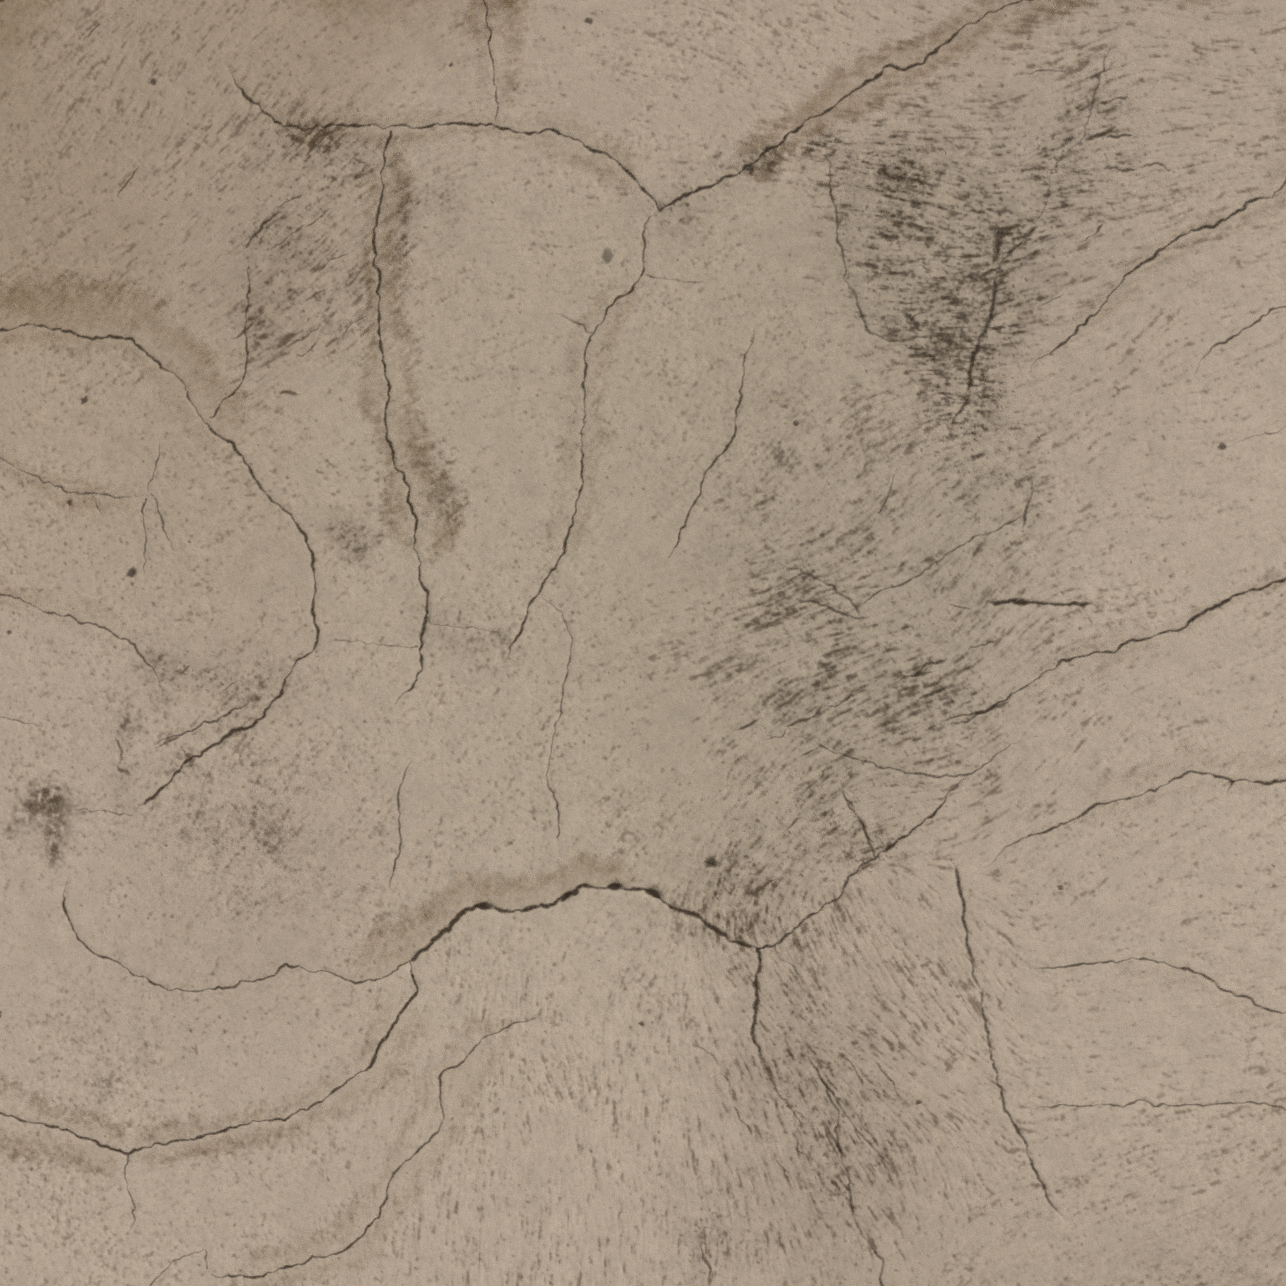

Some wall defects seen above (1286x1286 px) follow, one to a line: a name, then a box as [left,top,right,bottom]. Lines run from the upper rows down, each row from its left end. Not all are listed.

crack [235,0,1016,691]
crack [1047,182,1286,355]
crack [0,284,320,815]
crack [964,578,1286,723]
crack [1017,771,1286,842]
crack [205,1022,516,1279]
crack [0,745,977,1217]
crack [956,869,1056,1209]
crack [1055,958,1283,1014]